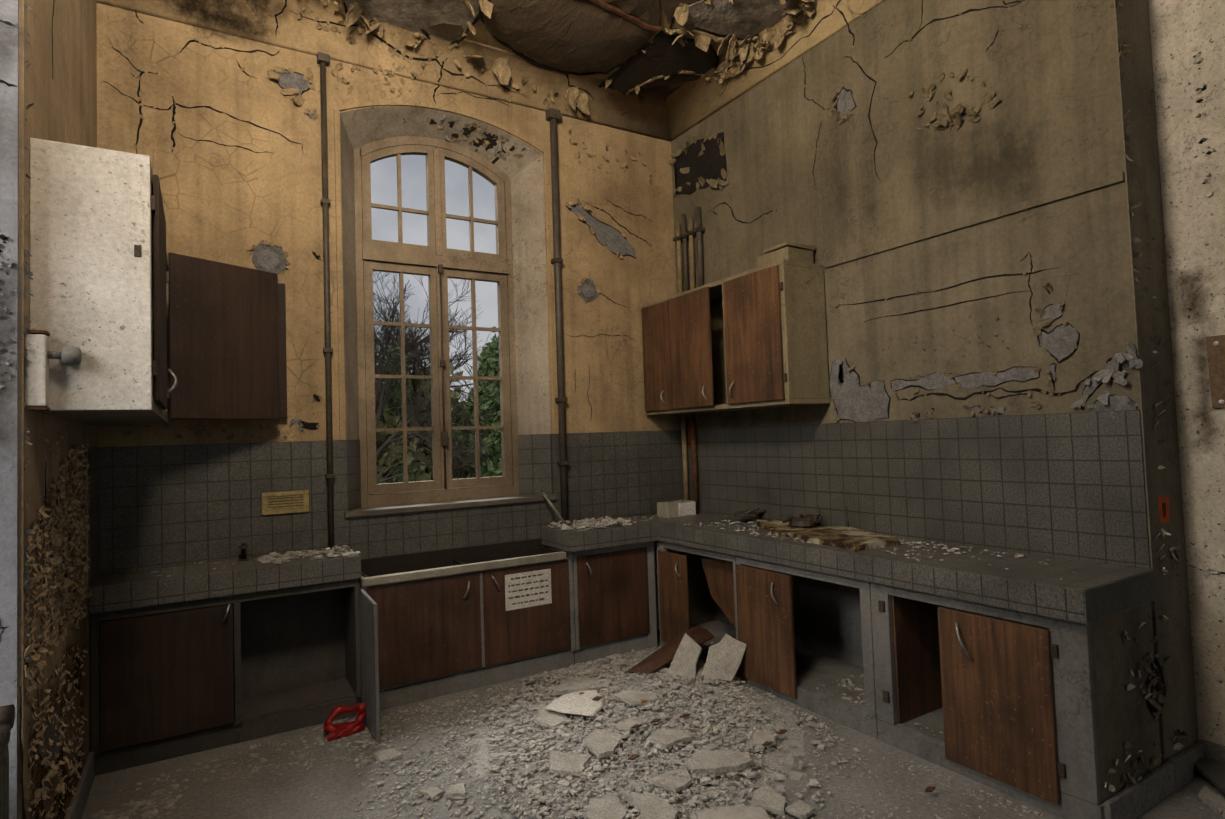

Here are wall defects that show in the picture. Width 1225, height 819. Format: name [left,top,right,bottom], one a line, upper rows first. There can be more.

water stain [173,0,269,37]
crack [103,0,528,153]
spalling [297,0,815,115]
crack [722,0,1025,193]
spalling [667,131,729,195]
peeling [0,212,34,389]
spalling [246,240,291,277]
peeling [565,199,636,259]
peeling [829,283,1080,422]
peeling [1071,343,1143,420]
spalling [1124,615,1170,724]
peeling [1104,727,1190,792]